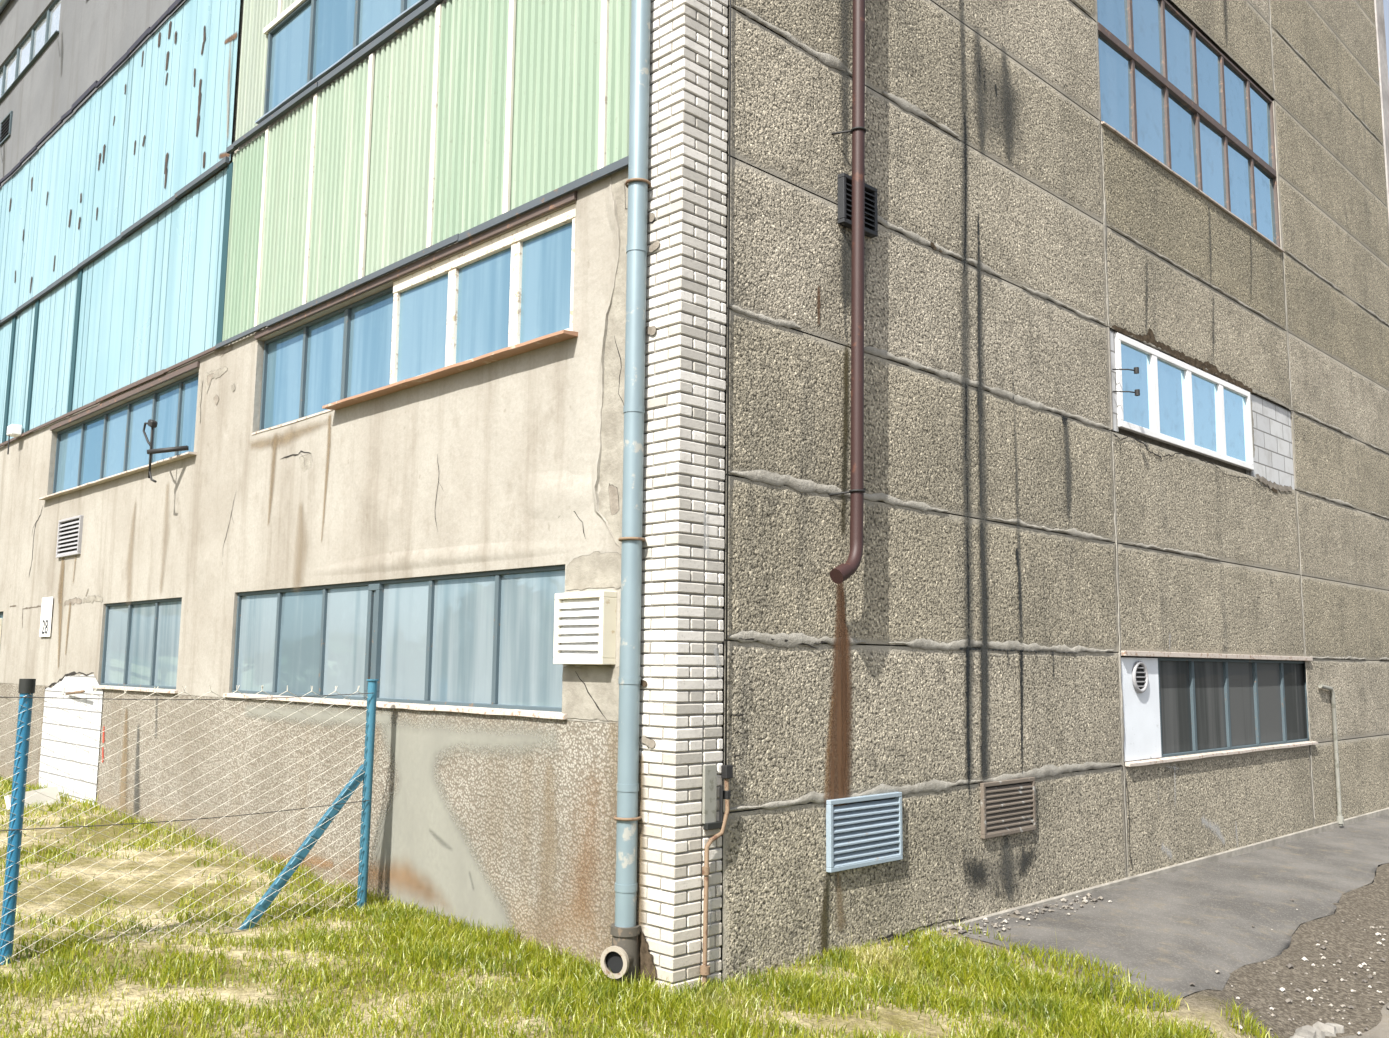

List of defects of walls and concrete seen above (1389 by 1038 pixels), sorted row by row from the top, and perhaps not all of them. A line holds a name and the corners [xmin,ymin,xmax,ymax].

damp [960,0,1075,799]
crack [1113,433,1270,489]
corrosion [827,582,851,813]
damp [963,835,1036,896]